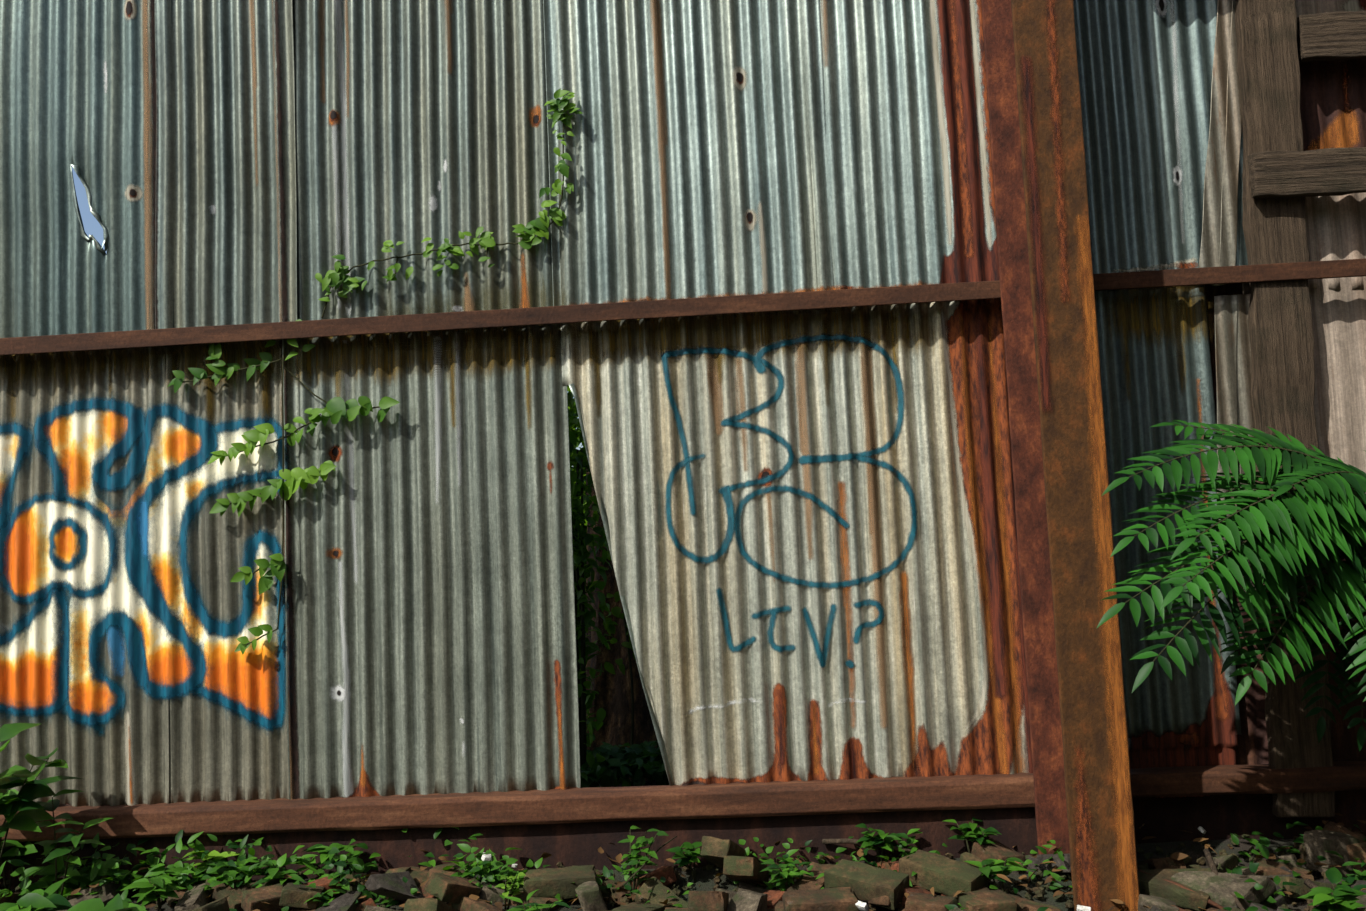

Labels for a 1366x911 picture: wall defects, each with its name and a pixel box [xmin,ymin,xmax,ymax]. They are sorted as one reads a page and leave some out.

rust [891,0,1000,287]
rust [554,660,573,790]
rust [681,482,887,786]
rust [797,342,812,559]
rust [862,337,887,727]
rust [901,298,1033,777]